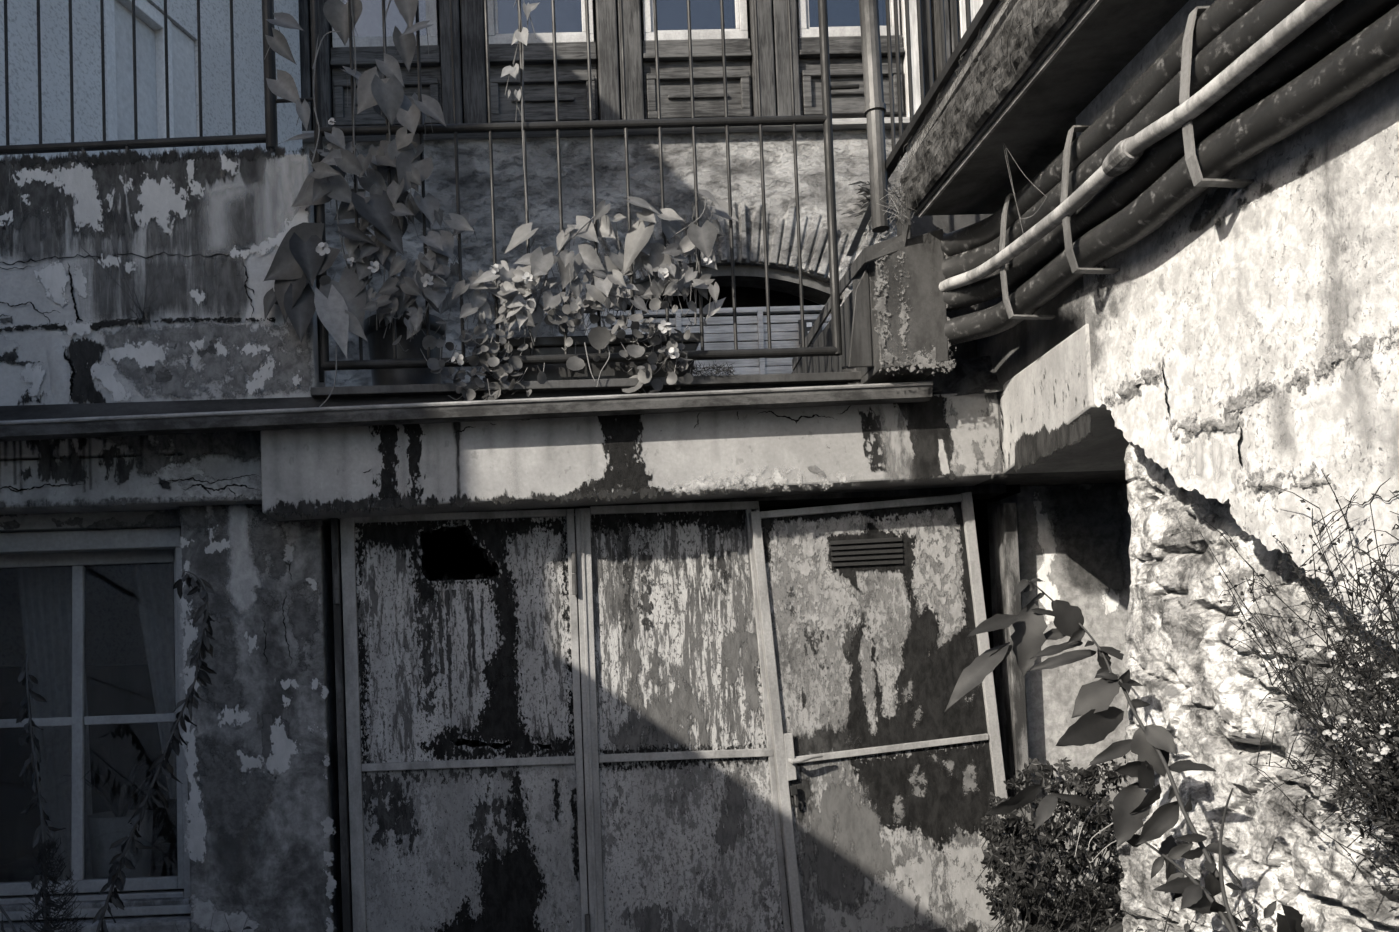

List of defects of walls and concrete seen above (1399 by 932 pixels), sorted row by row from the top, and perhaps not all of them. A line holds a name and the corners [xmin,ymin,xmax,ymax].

peeling [0,159,205,235]
peeling [230,206,310,259]
peeling [34,253,138,341]
crack [0,248,275,402]
peeling [87,336,304,403]
damp [5,431,261,485]
damp [246,414,851,671]
peeling [771,507,965,640]
peeling [217,669,330,779]
peeling [892,754,978,824]
peeling [320,816,337,932]
peeling [818,844,1005,932]